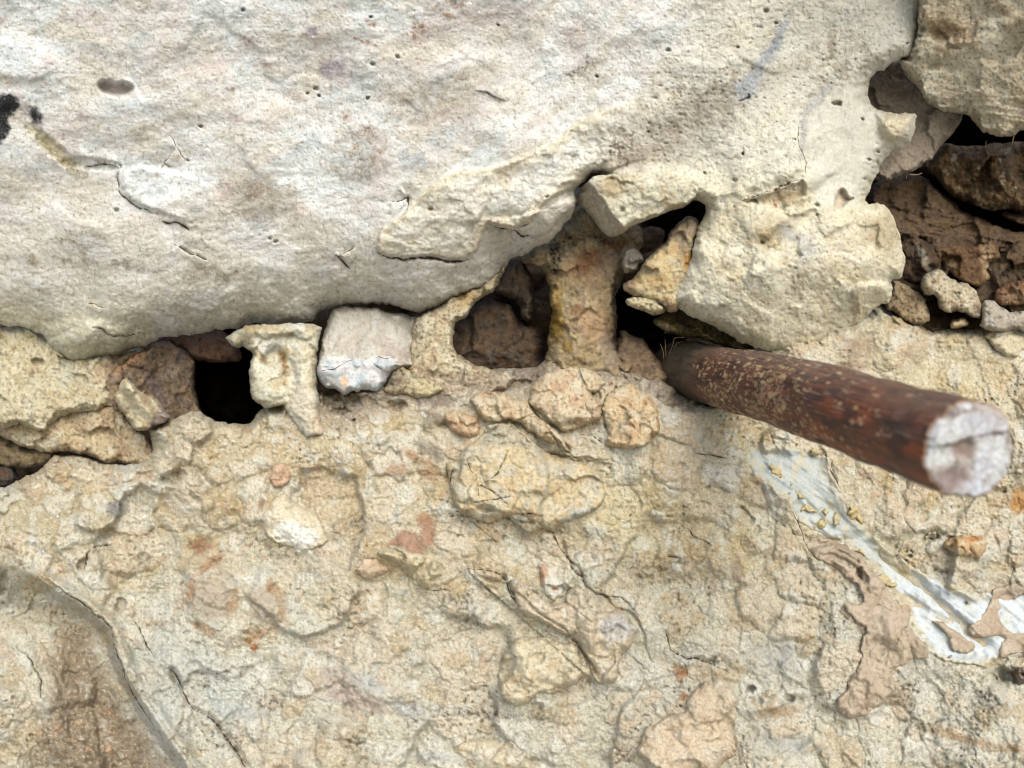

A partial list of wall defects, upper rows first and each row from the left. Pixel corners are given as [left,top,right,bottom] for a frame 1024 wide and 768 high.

crack [450,454,639,617]
crack [43,578,163,738]
crack [171,670,246,767]
crack [666,634,728,672]